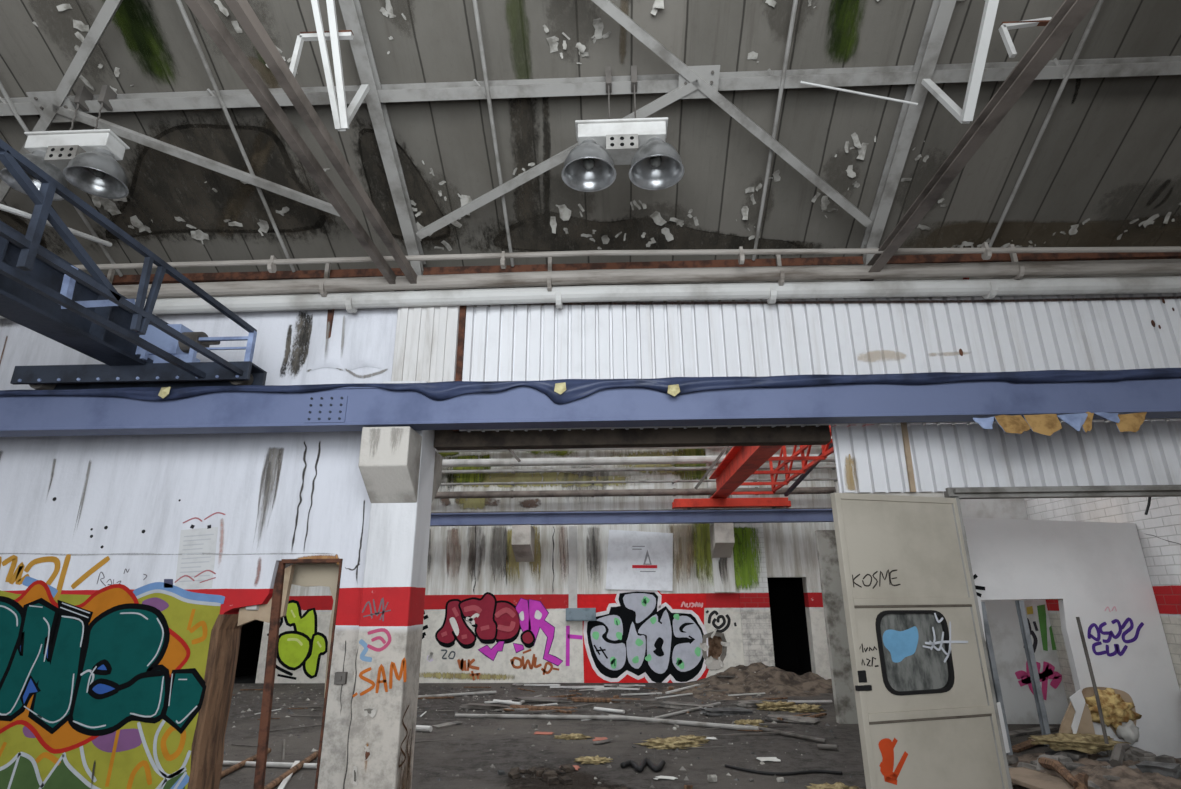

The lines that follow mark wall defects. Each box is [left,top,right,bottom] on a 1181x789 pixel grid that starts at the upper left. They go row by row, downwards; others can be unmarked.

leakage [115,0,151,53]
peeling [543,18,611,64]
peeling [651,0,664,15]
leakage [91,115,338,246]
leakage [353,119,404,245]
leakage [394,97,823,256]
peeling [835,133,876,190]
peeling [1117,202,1181,240]
corrosion [499,296,1181,311]
leakage [258,447,283,519]
leakage [490,526,541,579]
leakage [693,523,746,575]